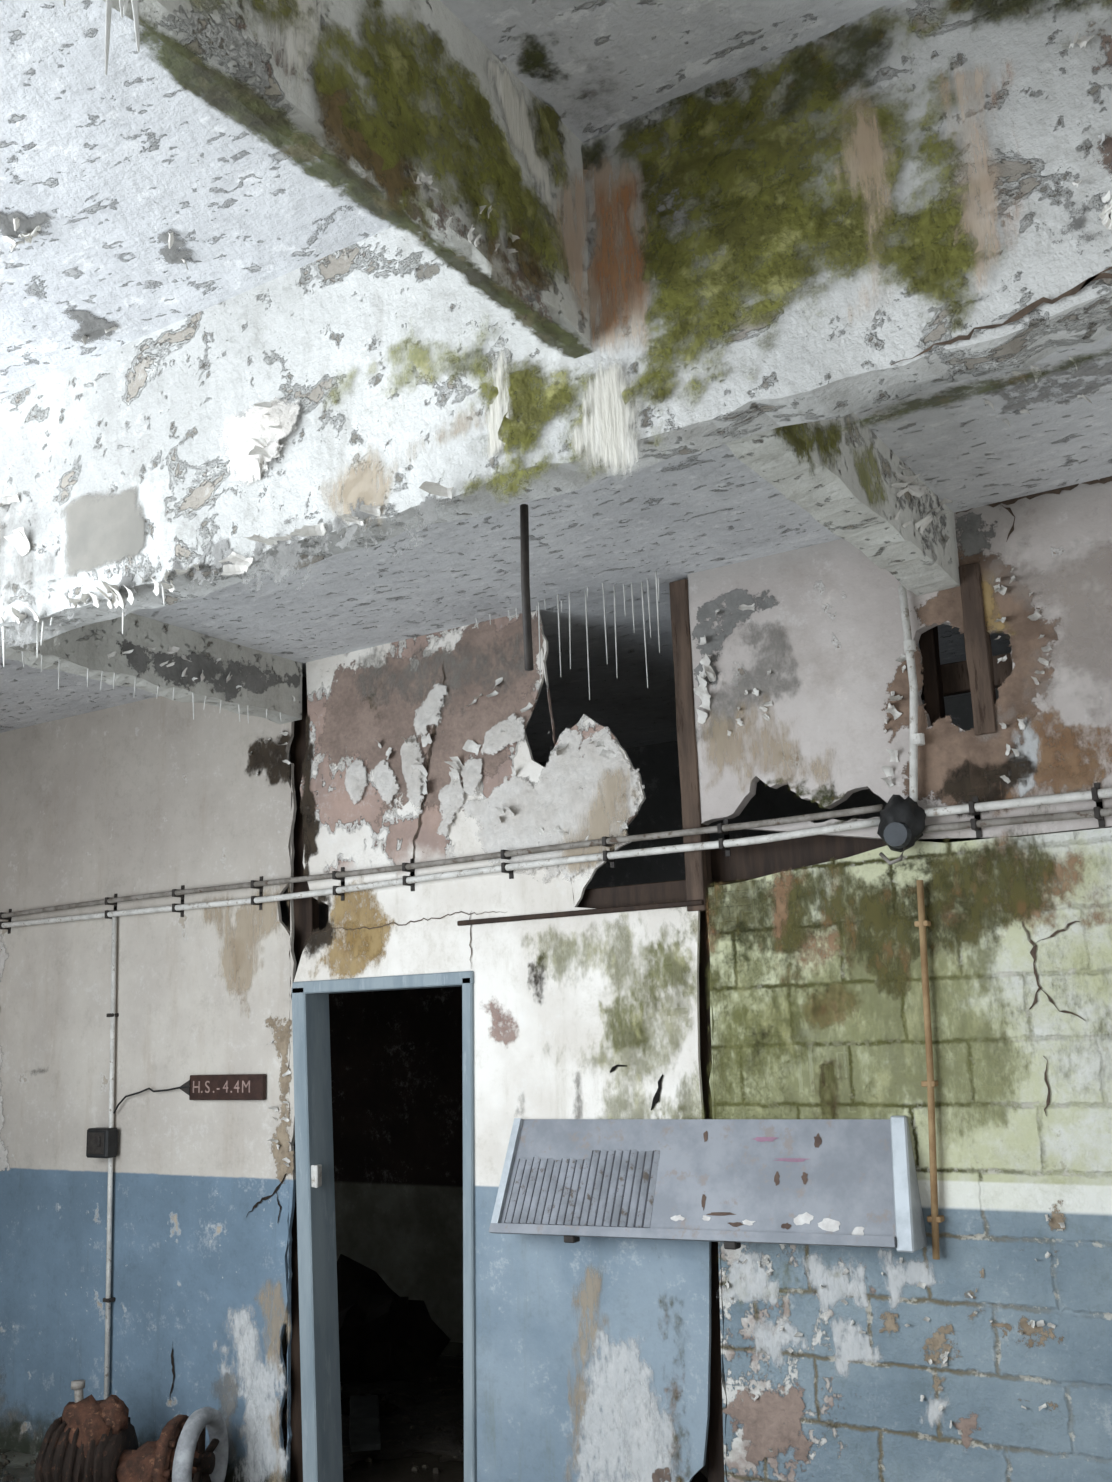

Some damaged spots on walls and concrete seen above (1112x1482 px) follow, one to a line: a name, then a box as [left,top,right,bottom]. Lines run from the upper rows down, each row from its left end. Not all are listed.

leakage [264,0,329,74]
leakage [488,35,567,235]
peeling [1050,132,1112,255]
crack [891,266,1112,365]
peeling [60,481,454,702]
peeling [881,450,1061,817]
peeling [314,611,644,883]
crack [1022,921,1086,1021]
crack [1042,1056,1050,1116]
peeling [722,1252,806,1367]
peeling [803,1250,981,1449]
peeling [723,1382,813,1466]